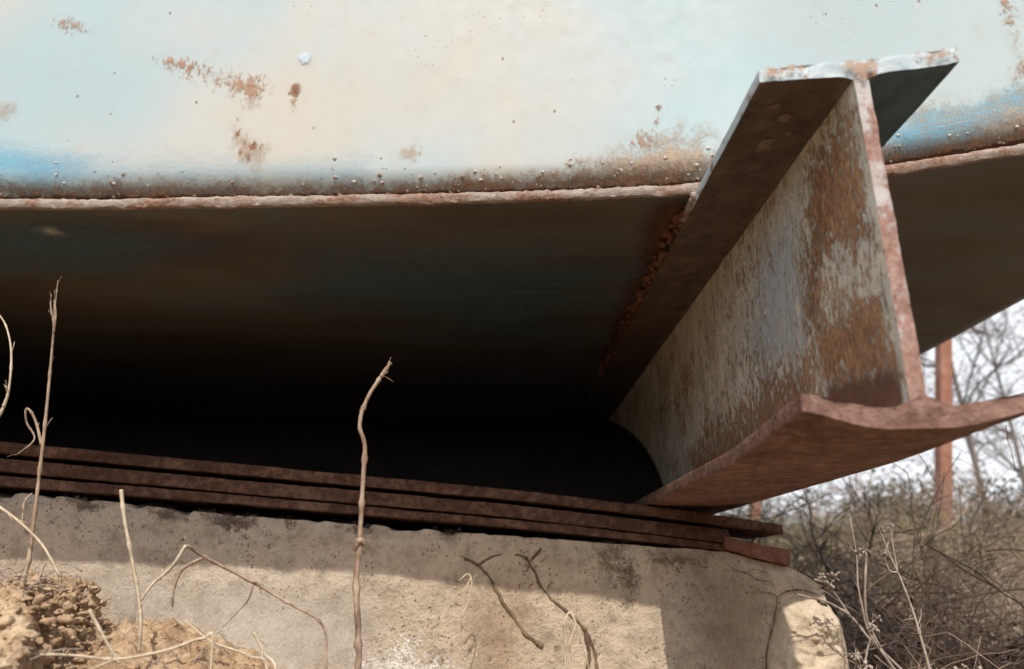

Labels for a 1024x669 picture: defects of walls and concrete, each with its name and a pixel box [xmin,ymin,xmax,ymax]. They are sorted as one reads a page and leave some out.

corrosion [152,56,265,102]
corrosion [0,105,714,200]
corrosion [765,64,803,77]
corrosion [842,58,878,80]
corrosion [882,60,1024,165]
corrosion [686,96,903,470]
crack [732,567,818,669]